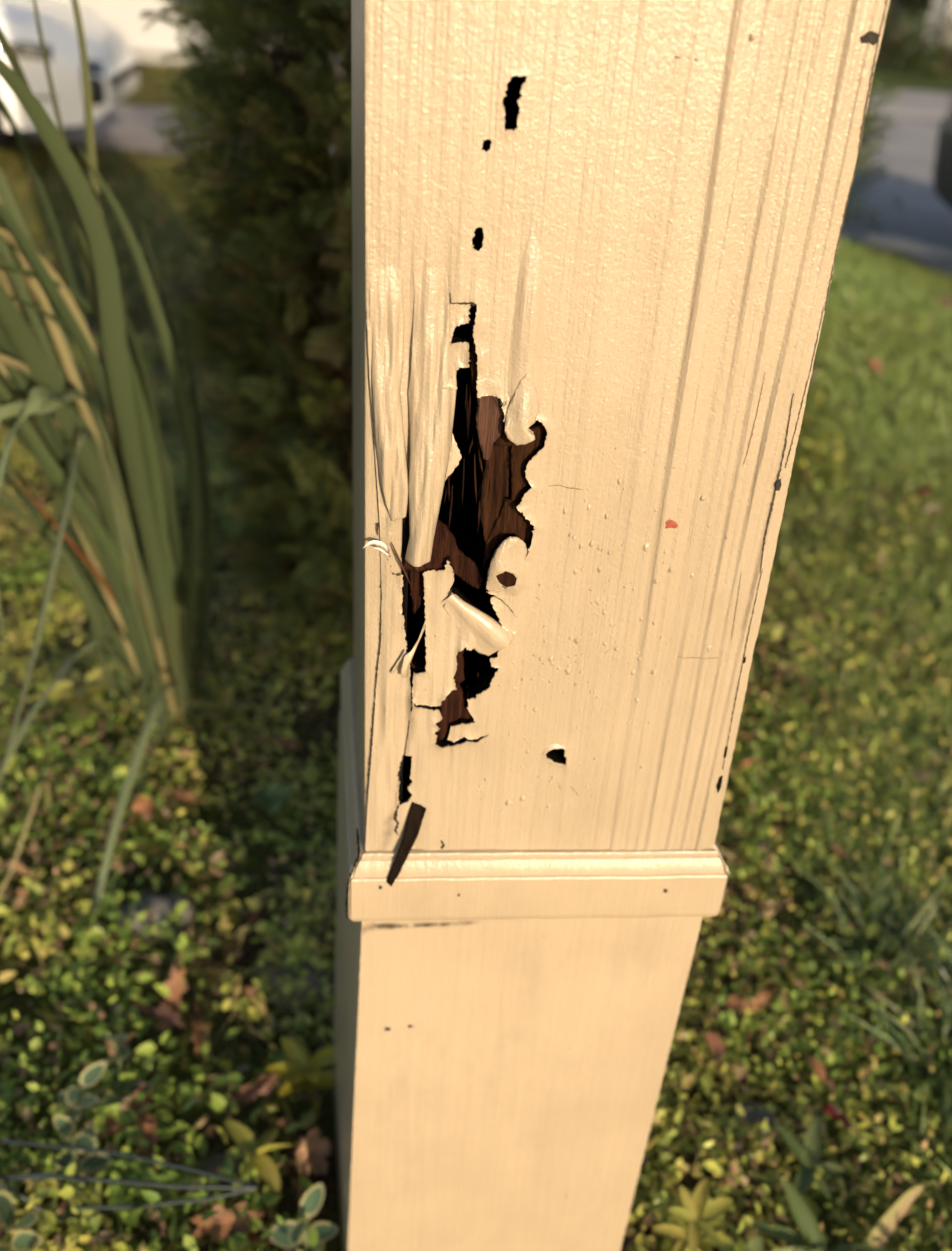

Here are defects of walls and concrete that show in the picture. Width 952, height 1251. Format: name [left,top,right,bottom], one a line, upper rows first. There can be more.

peeling [362,265,478,574]
peeling [501,372,547,470]
peeling [484,525,534,597]
peeling [401,585,511,746]
crack [345,581,412,918]
spalling [397,771,412,804]
spalling [543,744,567,766]